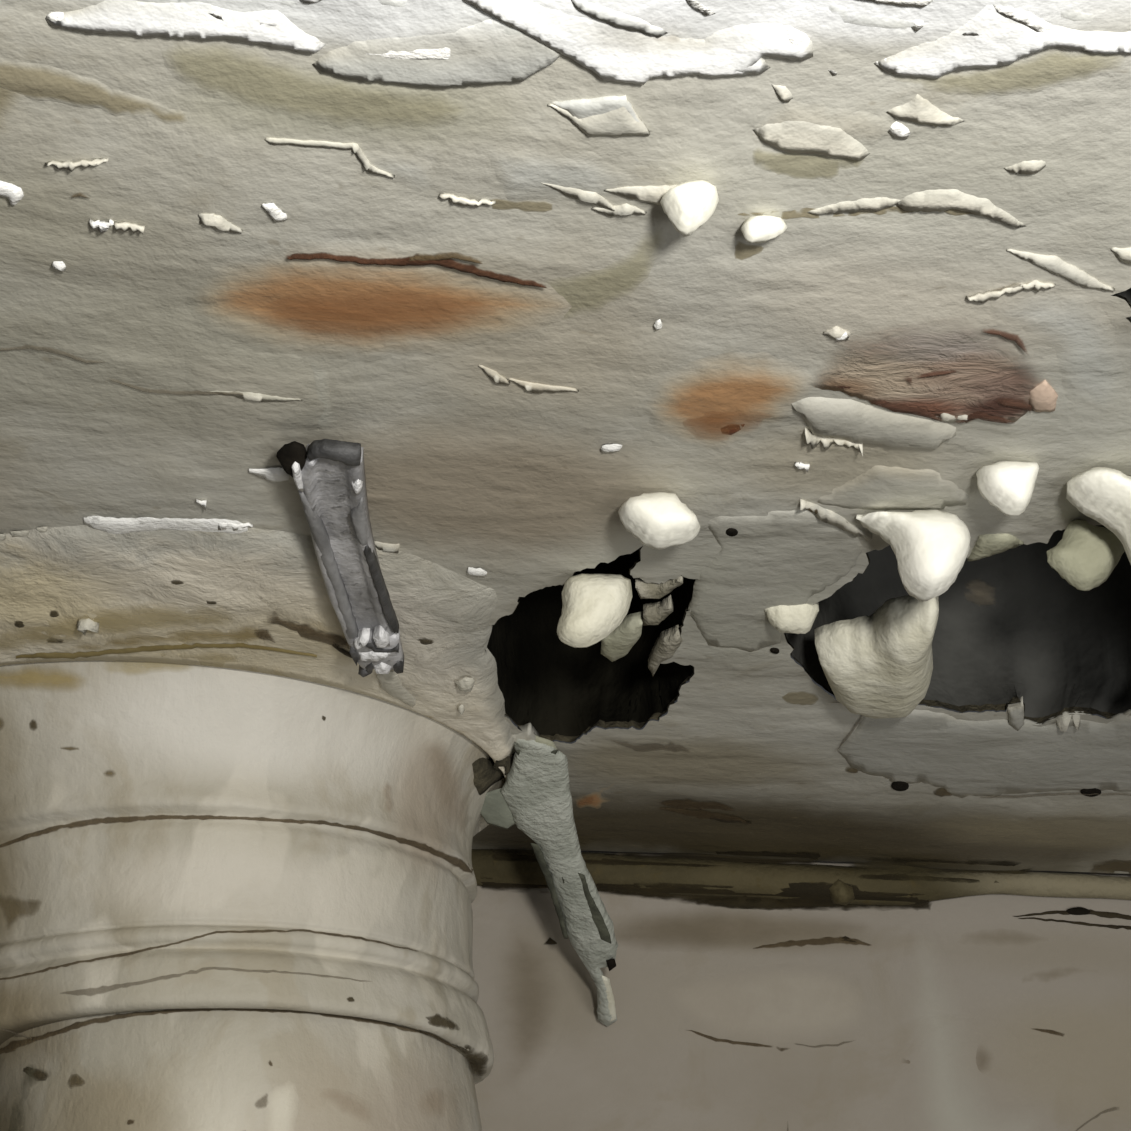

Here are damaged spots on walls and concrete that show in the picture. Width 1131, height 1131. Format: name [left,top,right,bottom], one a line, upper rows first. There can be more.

peeling [601,443,623,453]
peeling [601,465,970,696]
spalling [791,247,1131,456]
spalling [967,534,1024,561]